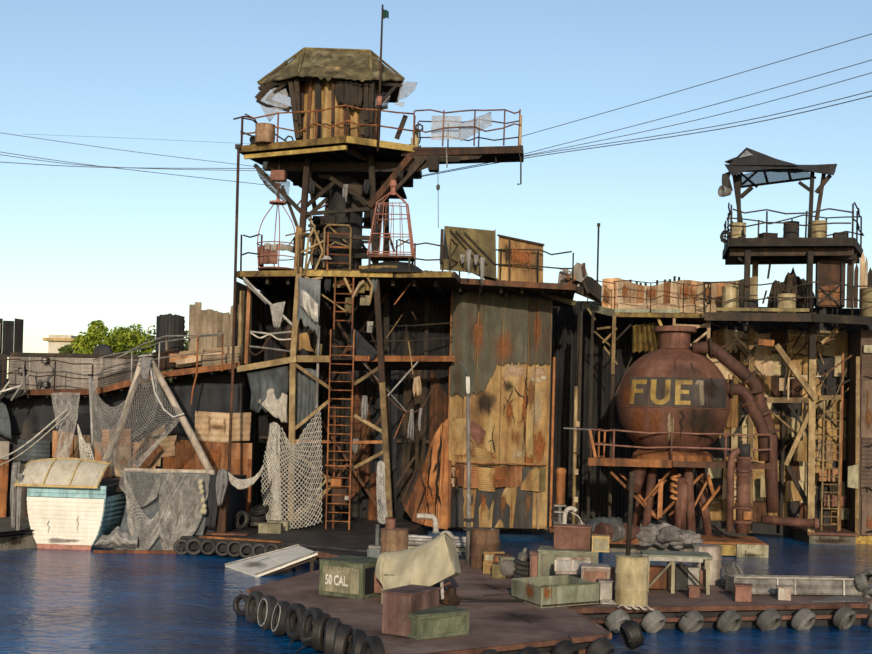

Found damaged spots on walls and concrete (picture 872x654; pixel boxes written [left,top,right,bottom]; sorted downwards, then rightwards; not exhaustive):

corrosion [506,391,526,443]
corrosion [525,433,545,466]